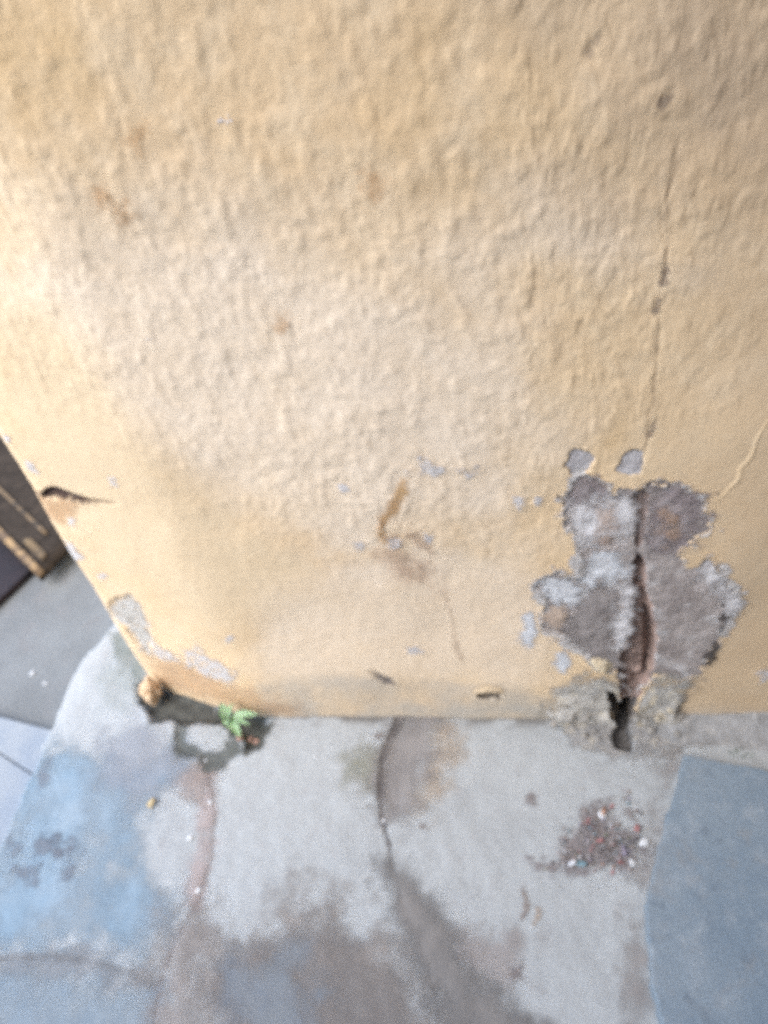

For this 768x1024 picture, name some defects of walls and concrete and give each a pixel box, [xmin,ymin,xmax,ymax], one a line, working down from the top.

peeling [108,594,238,685]
rust [380,487,406,540]
spalling [513,449,748,760]
crack [605,488,659,752]